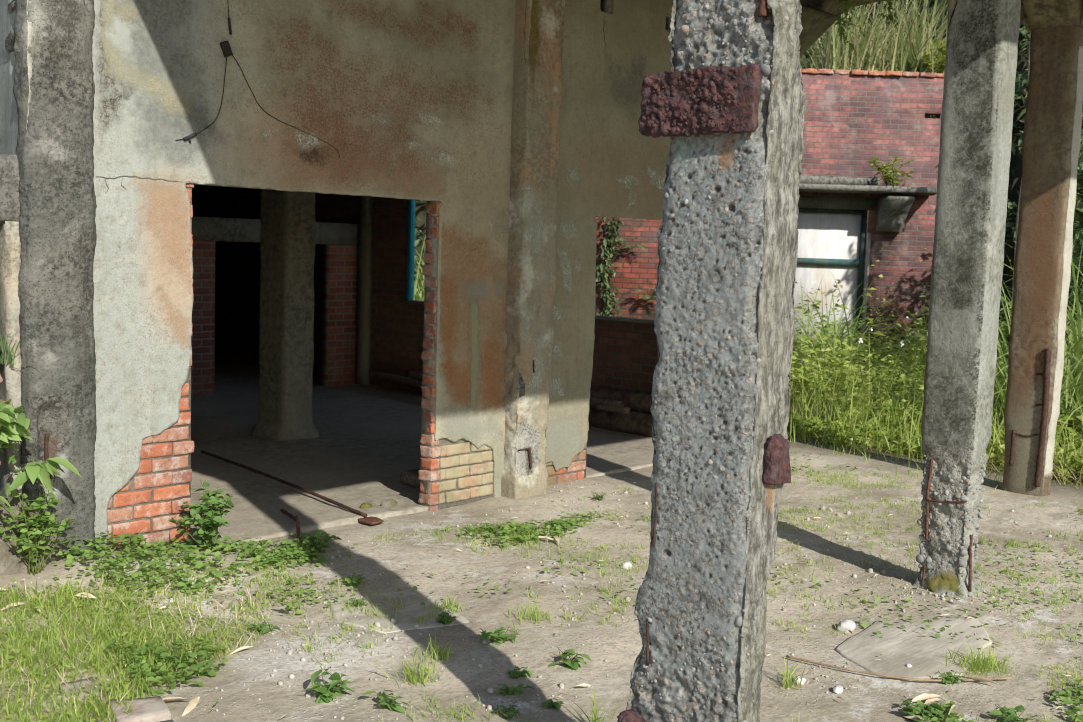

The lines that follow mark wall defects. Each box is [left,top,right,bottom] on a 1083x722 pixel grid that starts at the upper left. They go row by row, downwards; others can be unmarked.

crack [948,0,958,65]
rust [639,67,737,168]
spalling [107,383,194,549]
spalling [438,442,493,504]
spalling [512,422,586,486]